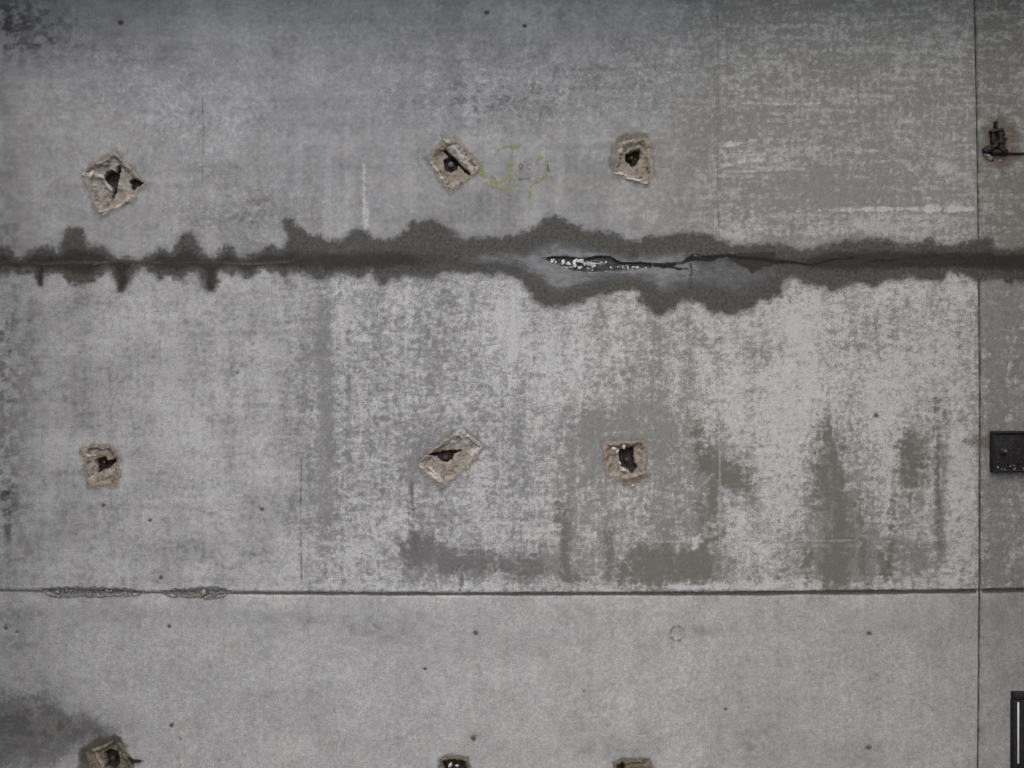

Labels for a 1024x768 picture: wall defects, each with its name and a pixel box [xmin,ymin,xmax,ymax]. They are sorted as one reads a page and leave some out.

leakage [0,164,1024,364]
crack [544,252,915,287]
leakage [606,532,779,591]